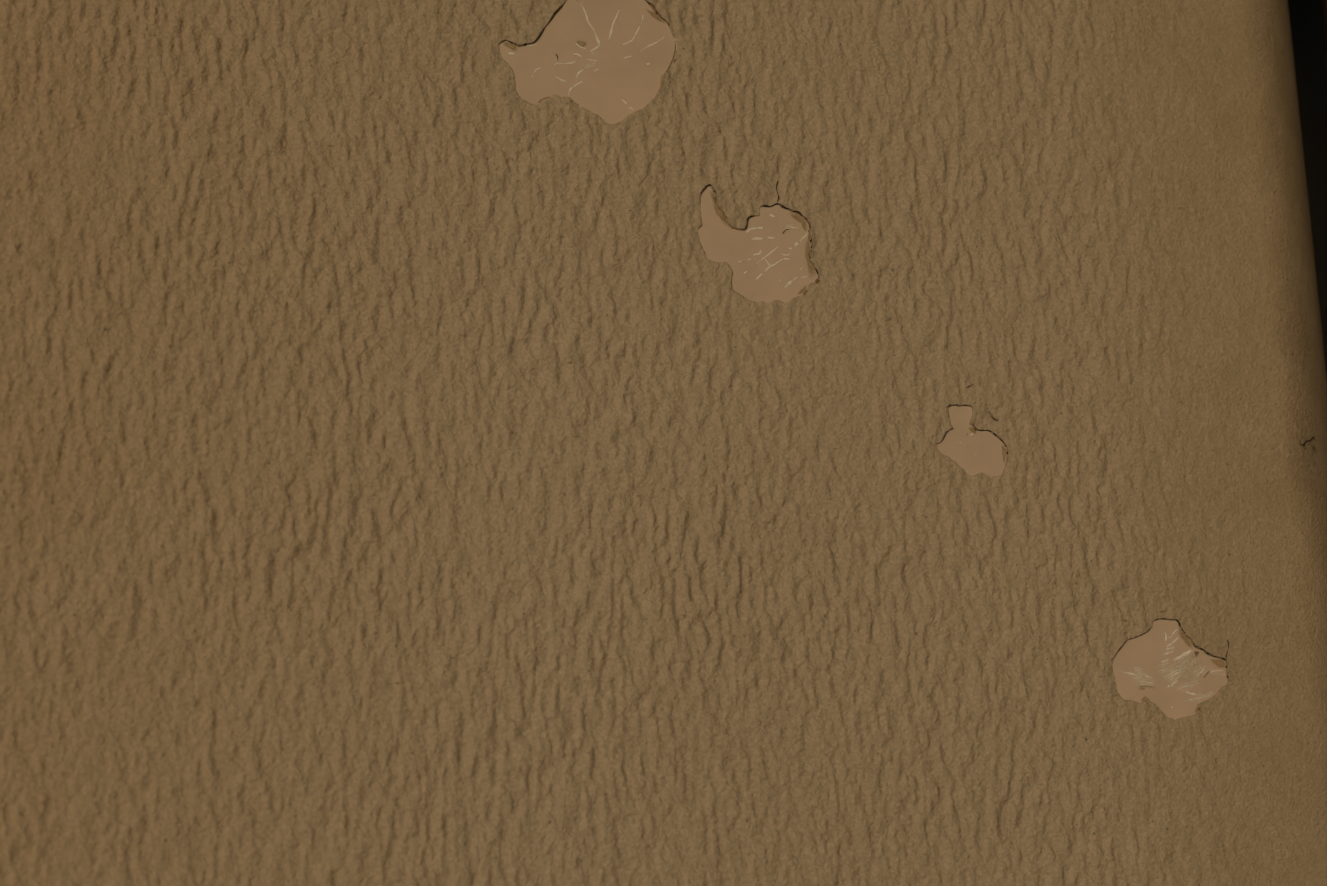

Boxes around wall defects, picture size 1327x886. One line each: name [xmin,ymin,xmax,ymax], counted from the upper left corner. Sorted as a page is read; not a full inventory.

peeling [499,0,678,124]
peeling [698,181,820,303]
peeling [936,404,1008,477]
peeling [1112,618,1229,720]